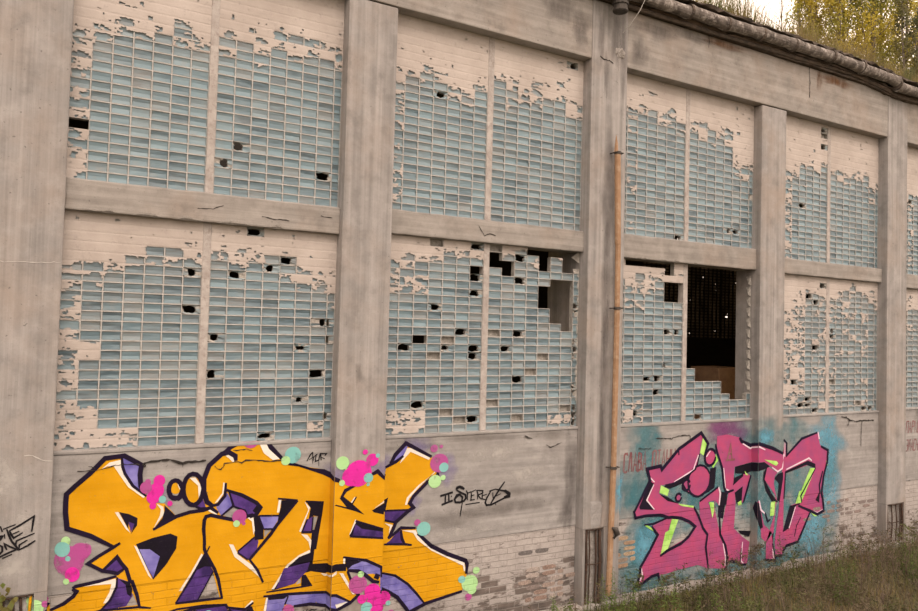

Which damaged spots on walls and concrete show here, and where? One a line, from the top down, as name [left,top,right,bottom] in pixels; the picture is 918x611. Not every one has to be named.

peeling [66,0,345,178]
peeling [395,13,584,131]
peeling [627,73,754,181]
peeling [54,209,337,451]
peeling [390,234,484,295]
peeling [623,256,699,310]
peeling [783,274,878,409]
peeling [785,115,879,259]
peeling [907,146,918,266]
peeling [386,410,426,434]
peeling [547,414,571,424]
peeling [622,399,643,423]